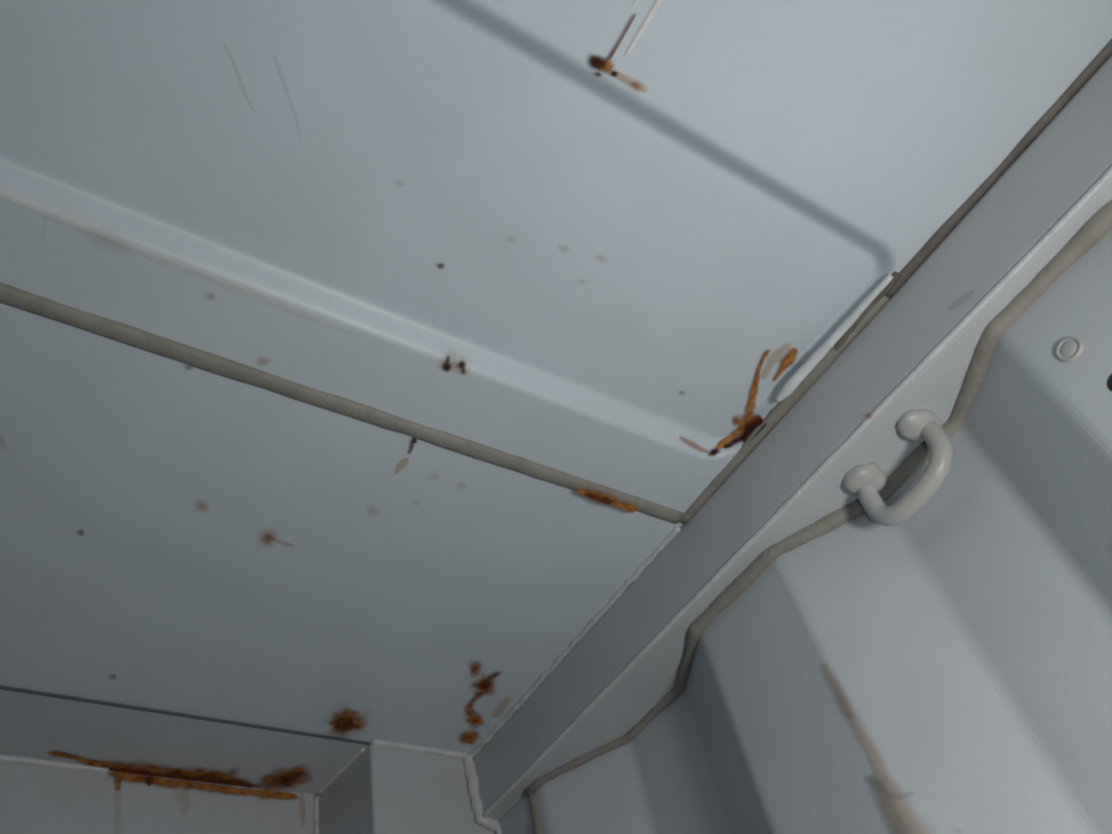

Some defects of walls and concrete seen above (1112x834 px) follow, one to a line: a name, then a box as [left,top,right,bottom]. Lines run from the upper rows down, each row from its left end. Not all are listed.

corrosion [578,489,638,513]
corrosion [331,709,364,735]
corrosion [460,663,499,744]
corrosion [51,751,308,800]